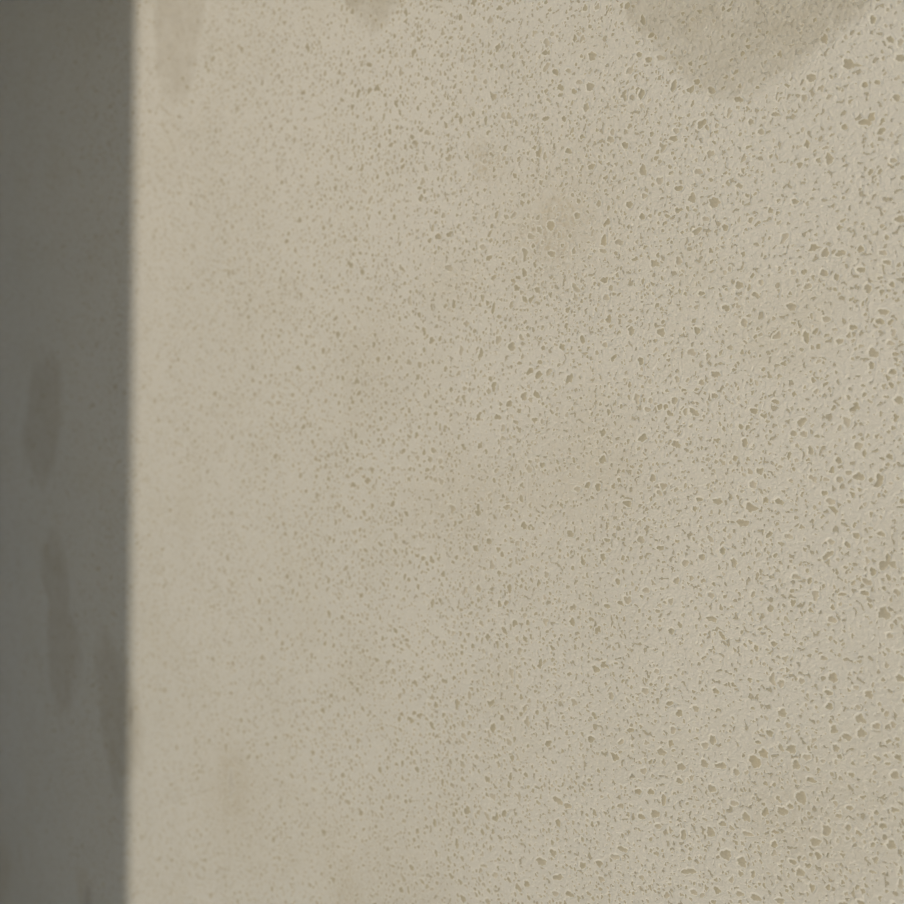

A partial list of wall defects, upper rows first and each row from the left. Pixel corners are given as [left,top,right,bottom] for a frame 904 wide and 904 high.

water stain [622,0,883,104]